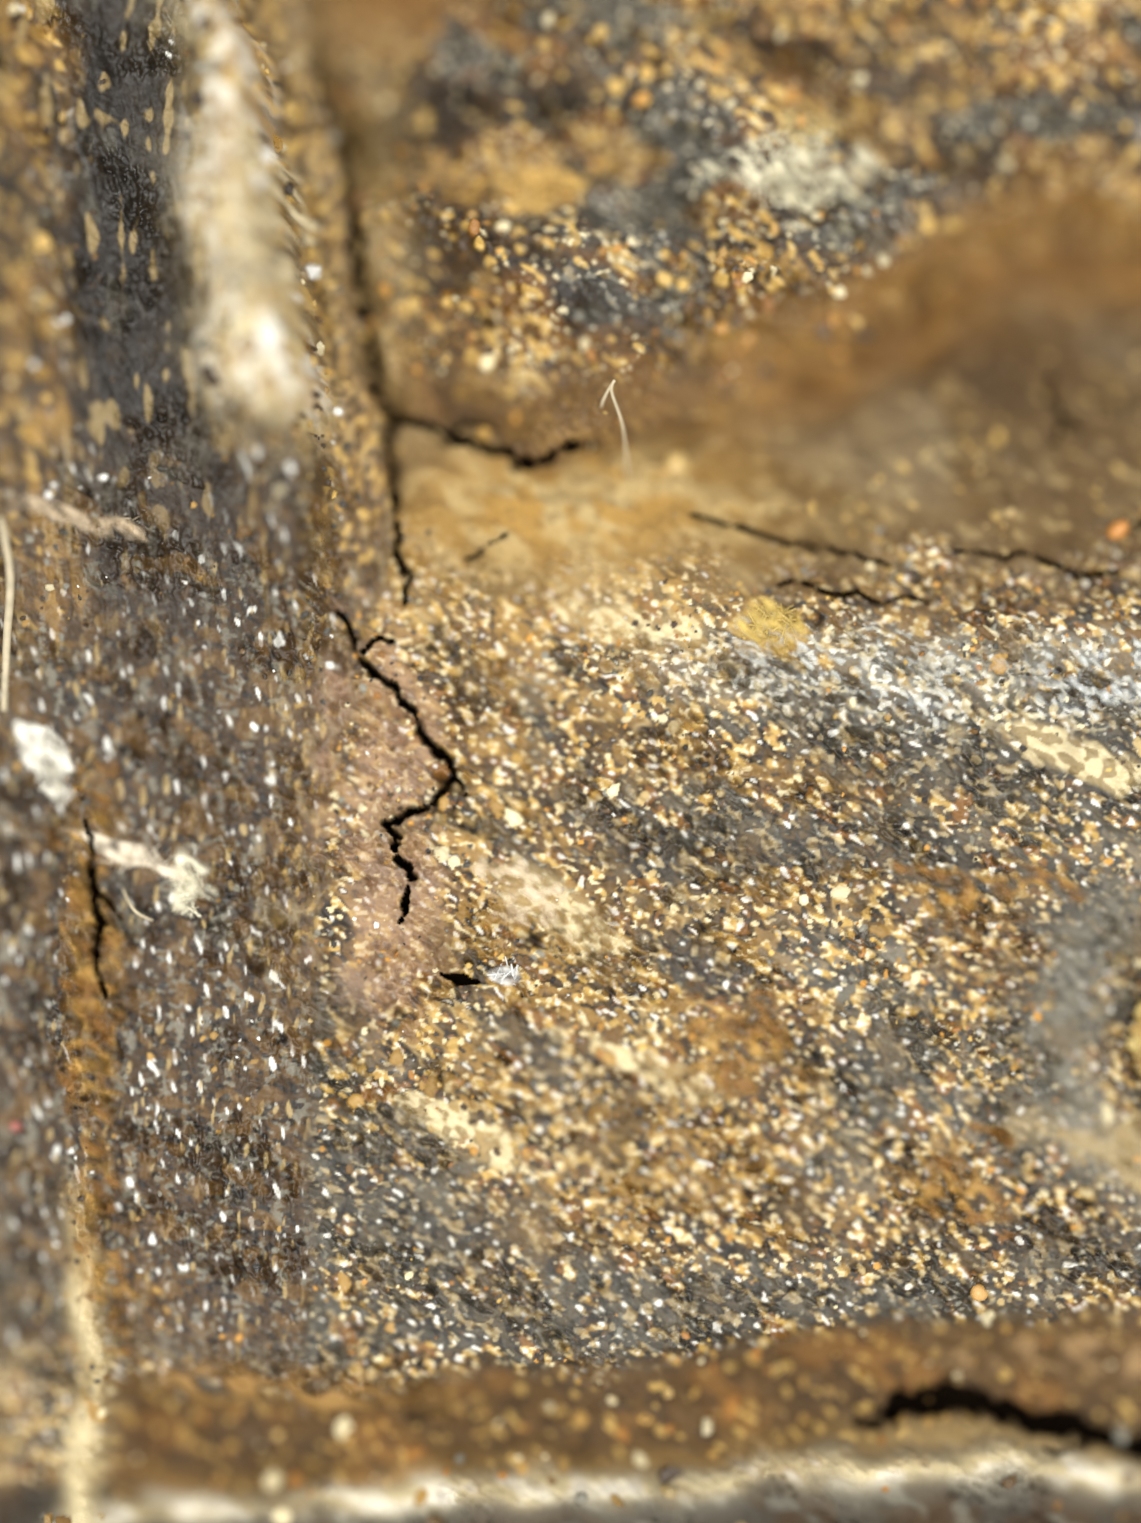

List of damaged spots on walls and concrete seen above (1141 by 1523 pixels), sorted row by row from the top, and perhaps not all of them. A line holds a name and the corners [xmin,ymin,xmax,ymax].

crack [313,53,599,925]